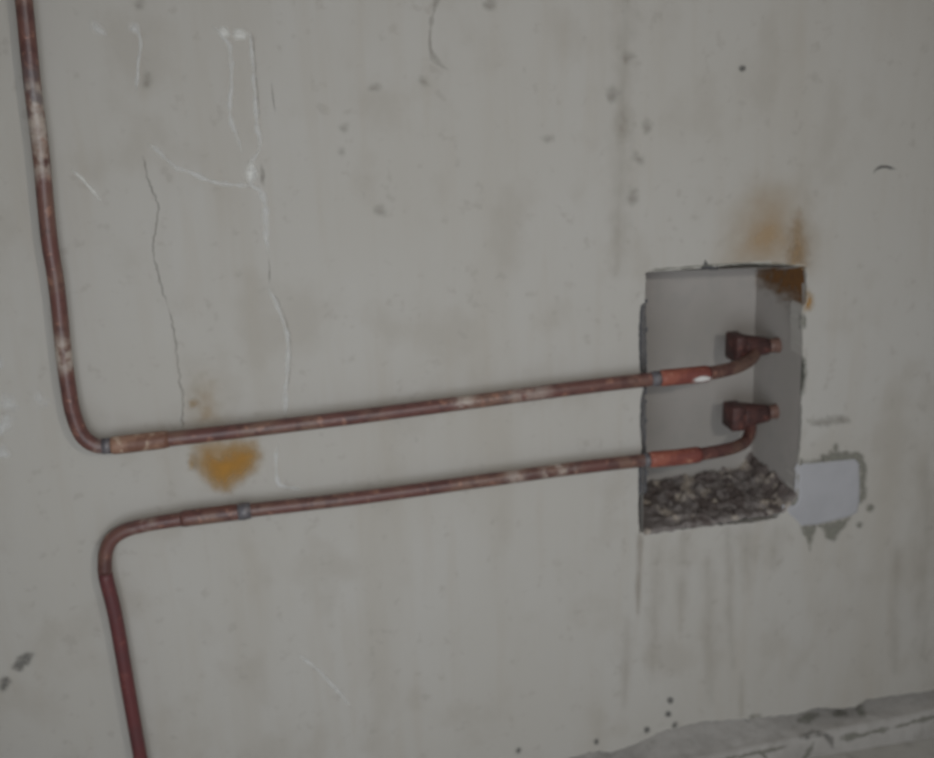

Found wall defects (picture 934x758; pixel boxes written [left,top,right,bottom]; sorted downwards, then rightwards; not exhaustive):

rust [758,240,811,308]
spalling [638,299,648,373]
spalling [640,387,648,454]
rust [206,449,253,485]
spalling [638,451,800,535]